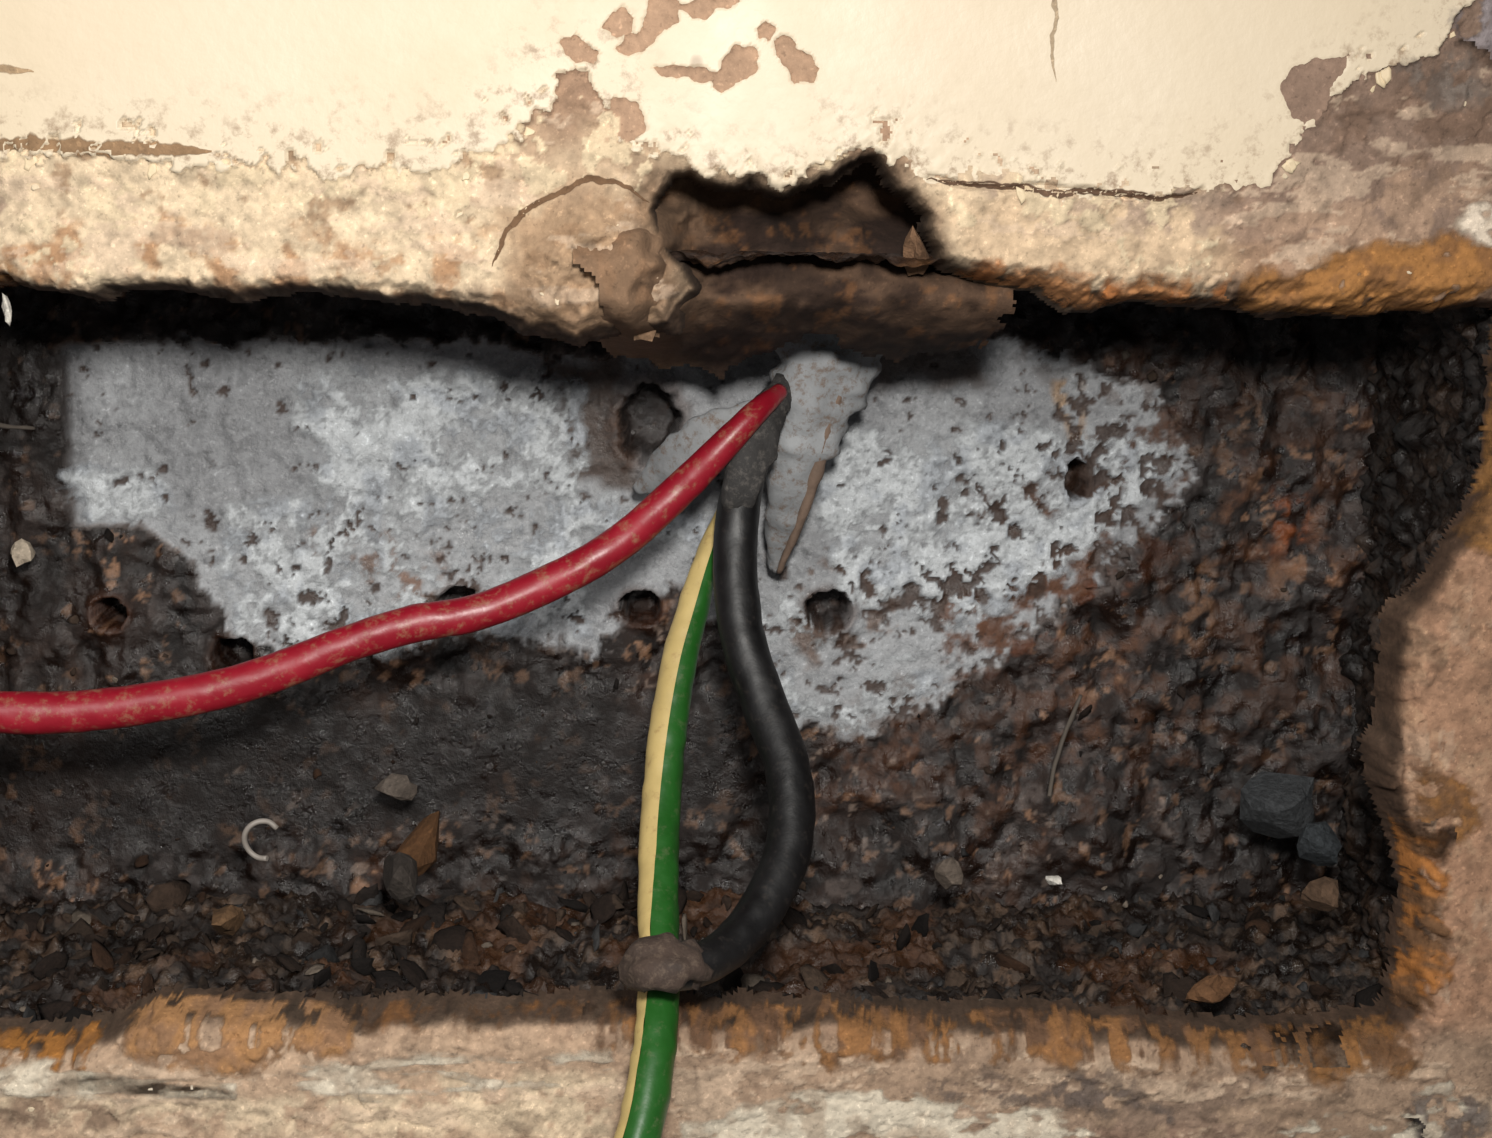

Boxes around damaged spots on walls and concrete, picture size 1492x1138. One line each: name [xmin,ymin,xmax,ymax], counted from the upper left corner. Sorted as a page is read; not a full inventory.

crack [1050,0,1059,78]
spalling [0,0,1492,379]
crack [926,177,1198,201]
peeling [10,538,35,567]
peeling [661,317,1492,1138]
rust [0,1022,100,1073]
rust [123,992,418,1075]
peeling [0,982,638,1138]
rust [598,1002,637,1051]
rust [677,995,1419,1084]